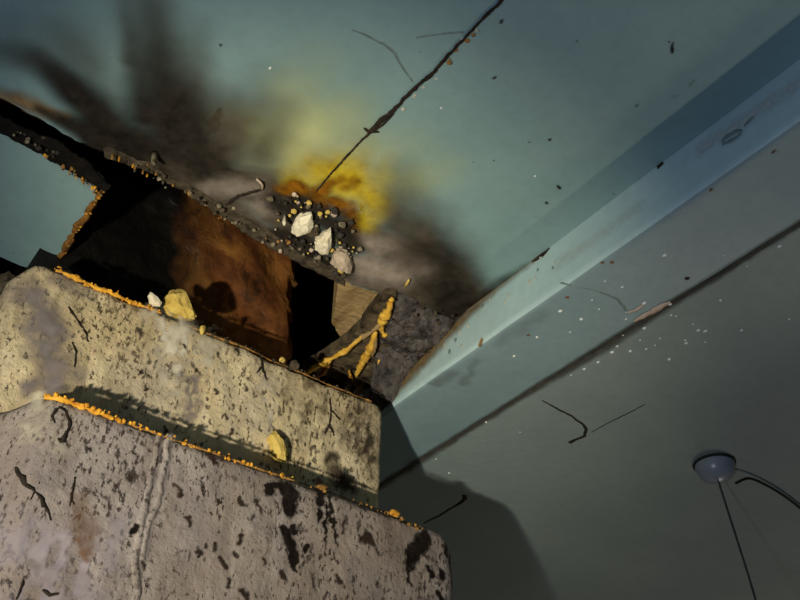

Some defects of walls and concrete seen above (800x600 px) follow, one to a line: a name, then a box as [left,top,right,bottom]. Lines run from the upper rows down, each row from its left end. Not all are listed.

crack [316,0,504,193]
damp [276,111,340,175]
flaking render [203,178,264,195]
damp [275,179,413,286]
flaking render [54,266,161,314]
peeling [628,301,671,322]
flaking render [188,324,372,403]
crack [50,406,72,443]
crack [324,398,340,436]
crack [542,400,645,444]
crack [14,467,51,521]
crack [424,495,467,524]